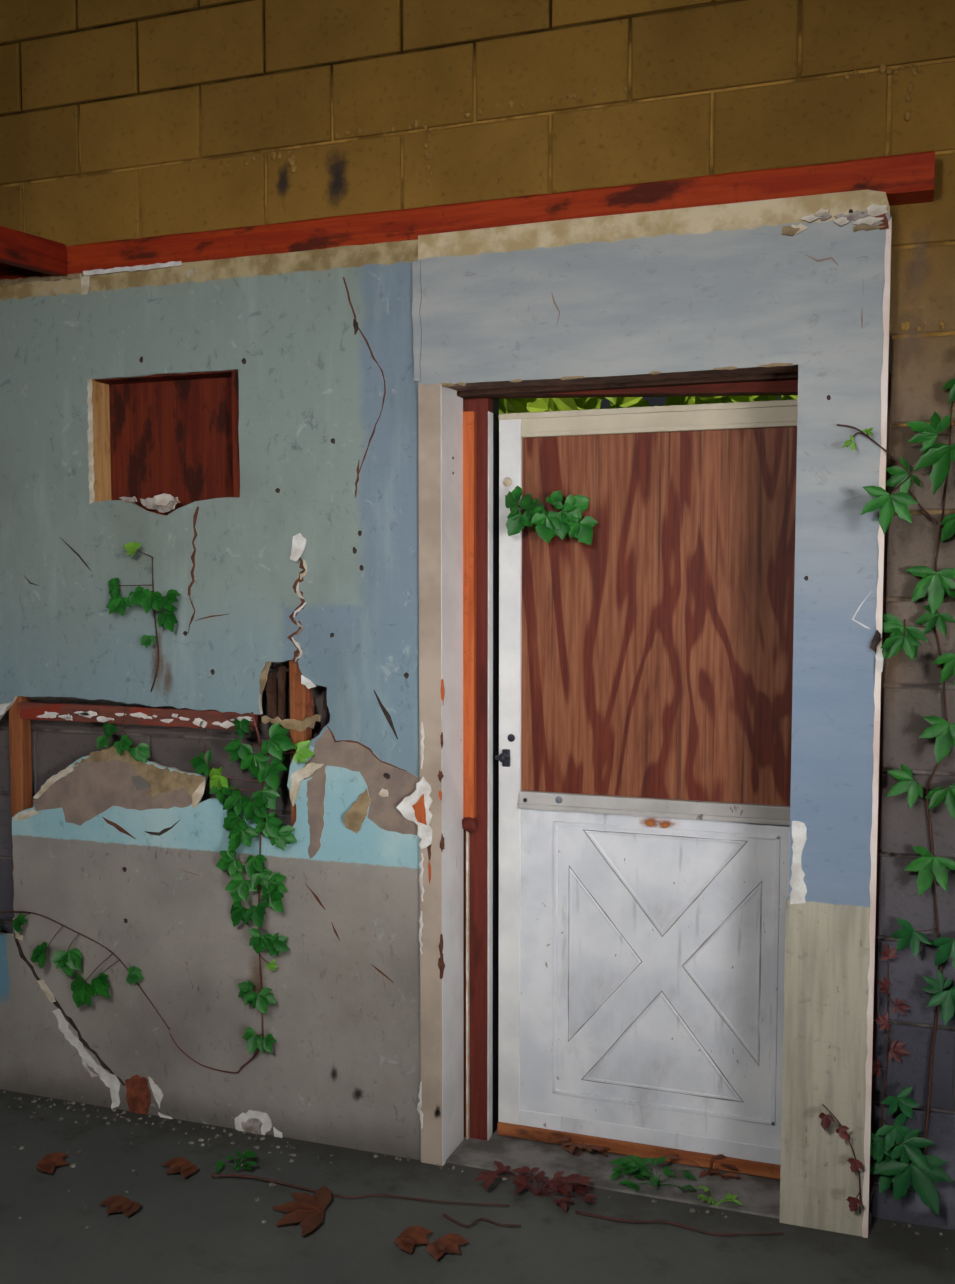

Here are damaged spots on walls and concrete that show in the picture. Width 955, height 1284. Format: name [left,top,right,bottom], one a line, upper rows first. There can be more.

damp [278,169,288,193]
damp [329,161,345,198]
spalling [782,204,889,236]
crack [343,277,386,497]
spalling [87,379,95,504]
spalling [120,494,180,513]
crack [188,506,228,634]
spalling [373,690,398,739]
peeling [396,722,445,954]
peeling [790,821,807,904]
crack [13,918,125,1109]
spalling [235,1110,283,1138]